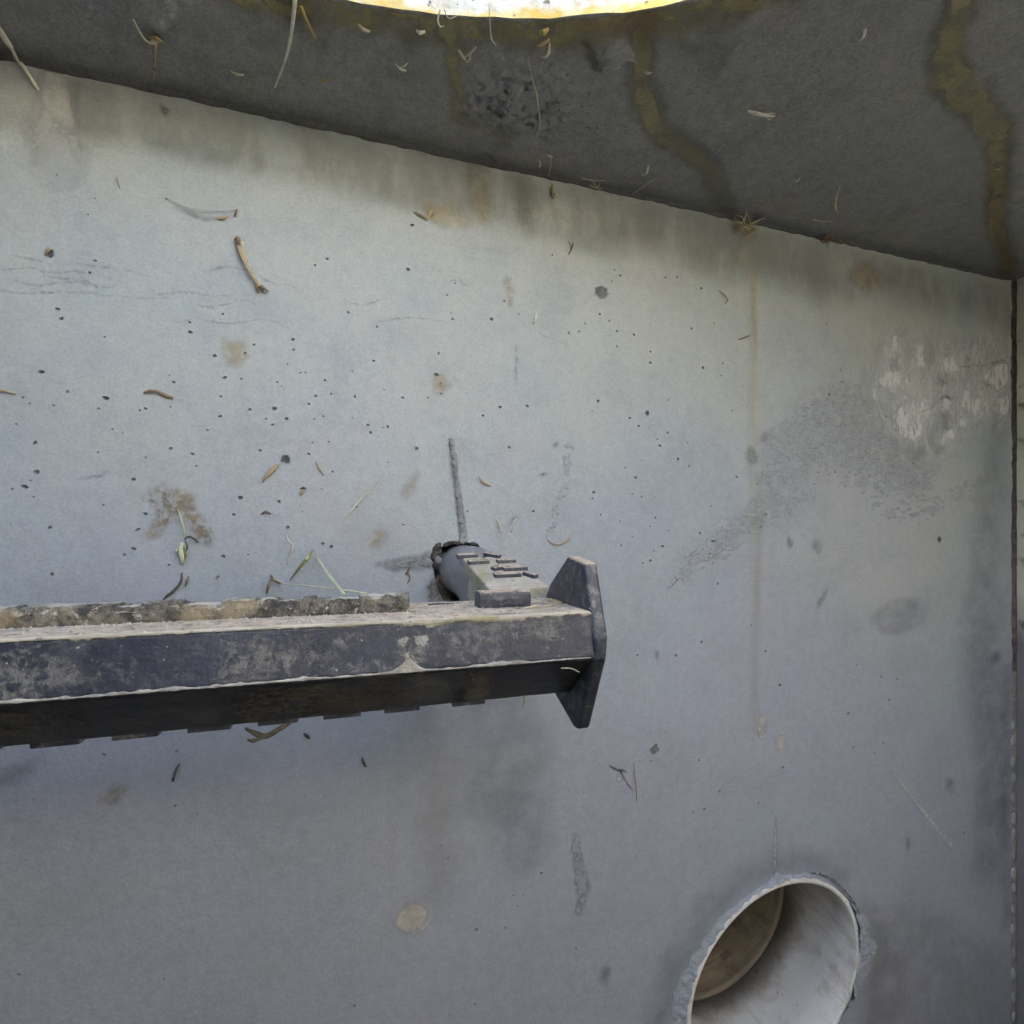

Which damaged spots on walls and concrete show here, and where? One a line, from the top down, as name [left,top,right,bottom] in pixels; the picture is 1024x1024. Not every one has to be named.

damp [226,0,783,161]
damp [930,0,1014,272]